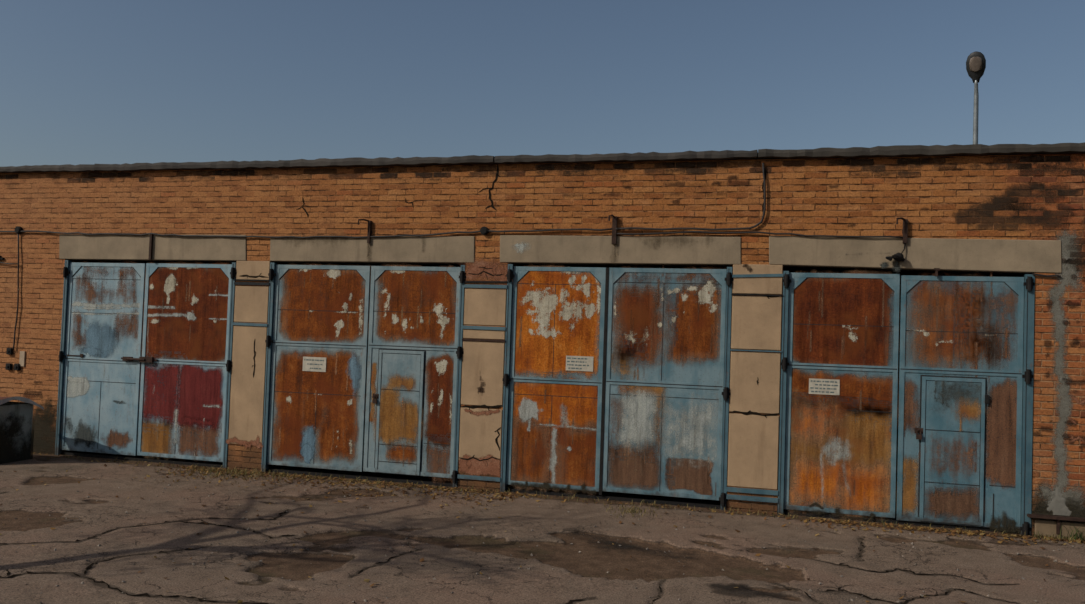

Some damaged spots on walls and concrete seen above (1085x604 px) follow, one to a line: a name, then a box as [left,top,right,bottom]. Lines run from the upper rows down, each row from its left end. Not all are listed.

crack [479,164,500,210]
rust [73,262,229,364]
peeling [383,289,450,338]
peeling [520,271,601,338]
peeling [625,280,717,343]
rust [272,263,457,480]
peeling [518,399,596,484]
rust [510,264,725,496]
rust [788,271,980,522]
rust [905,271,1017,486]
crack [0,510,294,604]
crack [772,536,1015,604]